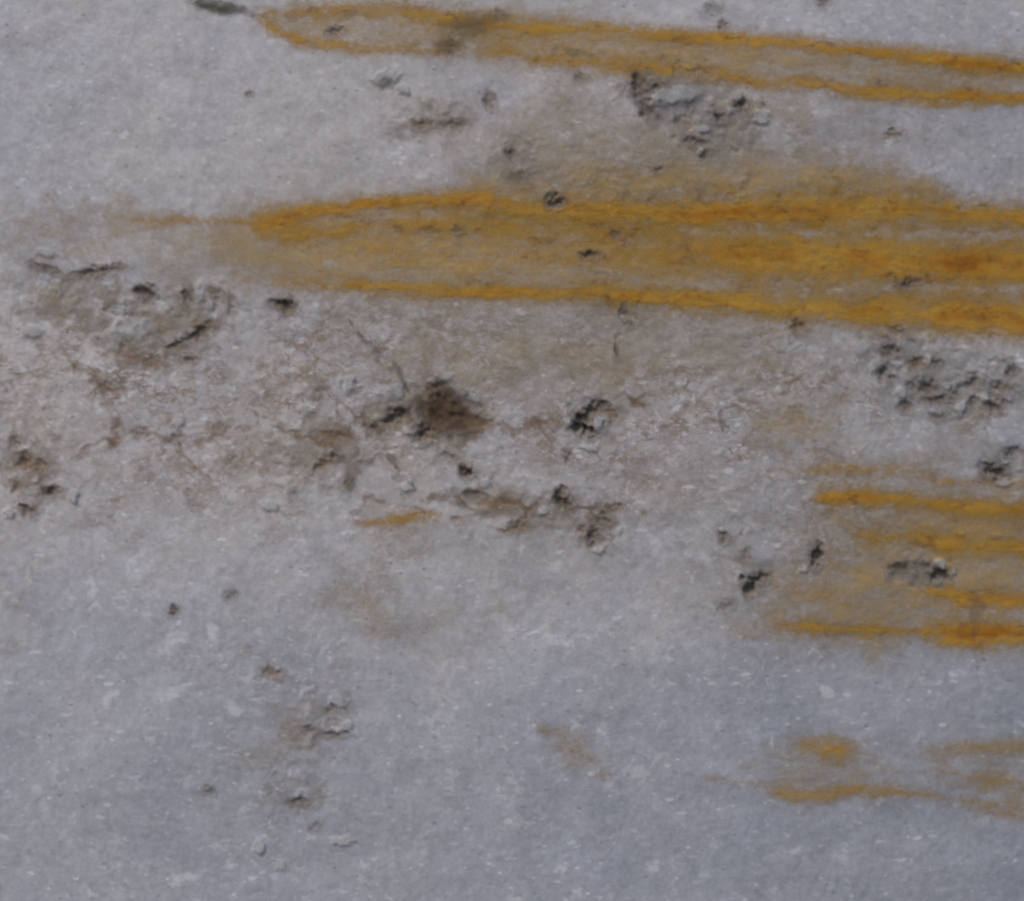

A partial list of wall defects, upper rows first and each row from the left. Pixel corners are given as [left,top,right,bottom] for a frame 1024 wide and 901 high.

rust [266,5,1024,107]
spalling [632,75,696,116]
rust [231,163,1024,336]
spalling [23,266,213,359]
spalling [378,374,480,449]
spalling [563,401,612,451]
spalling [879,344,1024,421]
spalling [460,467,528,529]
spalling [554,486,608,553]
rust [770,480,1024,649]
rust [776,785,920,801]